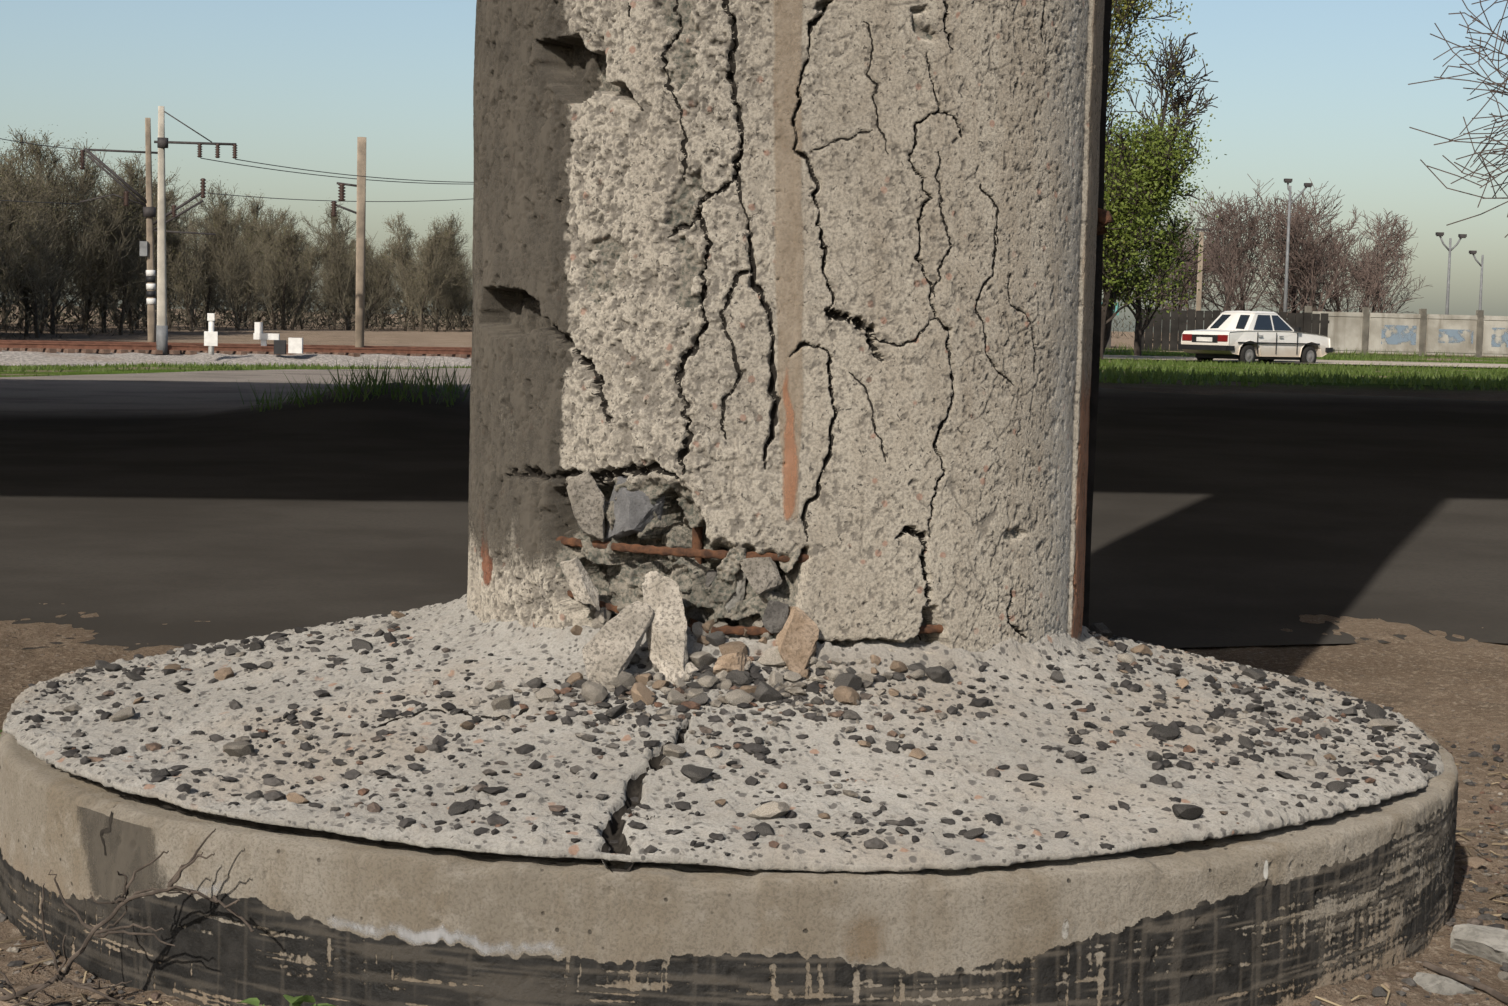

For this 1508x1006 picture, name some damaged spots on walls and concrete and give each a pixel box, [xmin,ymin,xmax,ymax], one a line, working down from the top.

crack [510,0,1036,641]
spalling [554,479,804,640]
rust [783,381,797,519]
rust [1071,386,1091,638]
damp [78,806,166,902]
crack [76,726,688,872]
crack [1185,834,1246,843]
efflorescence [399,929,489,953]